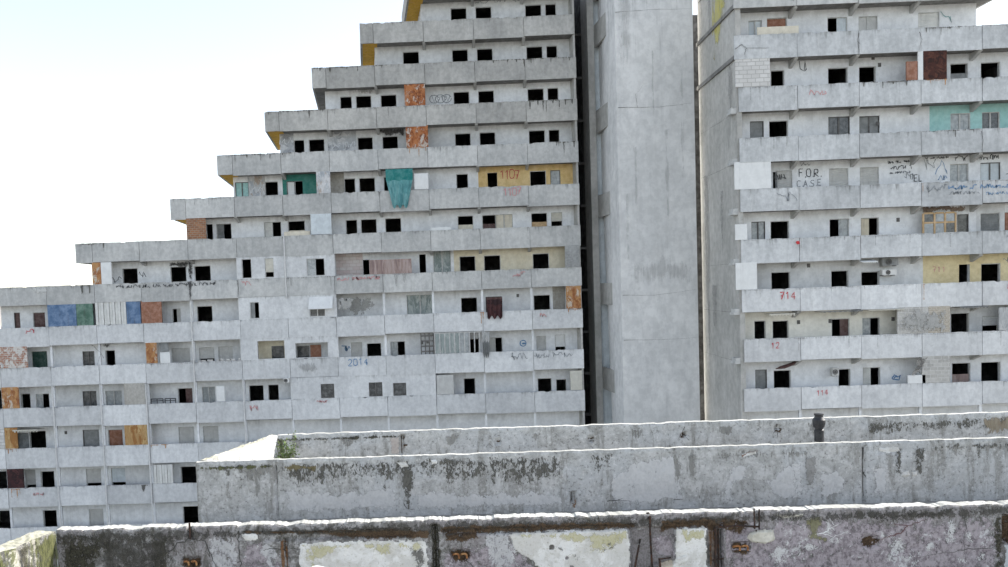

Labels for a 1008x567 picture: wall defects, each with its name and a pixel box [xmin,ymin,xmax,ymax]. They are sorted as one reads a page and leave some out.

corrosion [406,125,428,153]
corrosion [566,286,581,312]
leakage [286,461,399,491]
leakage [422,456,560,486]
flaking render [500,526,720,567]